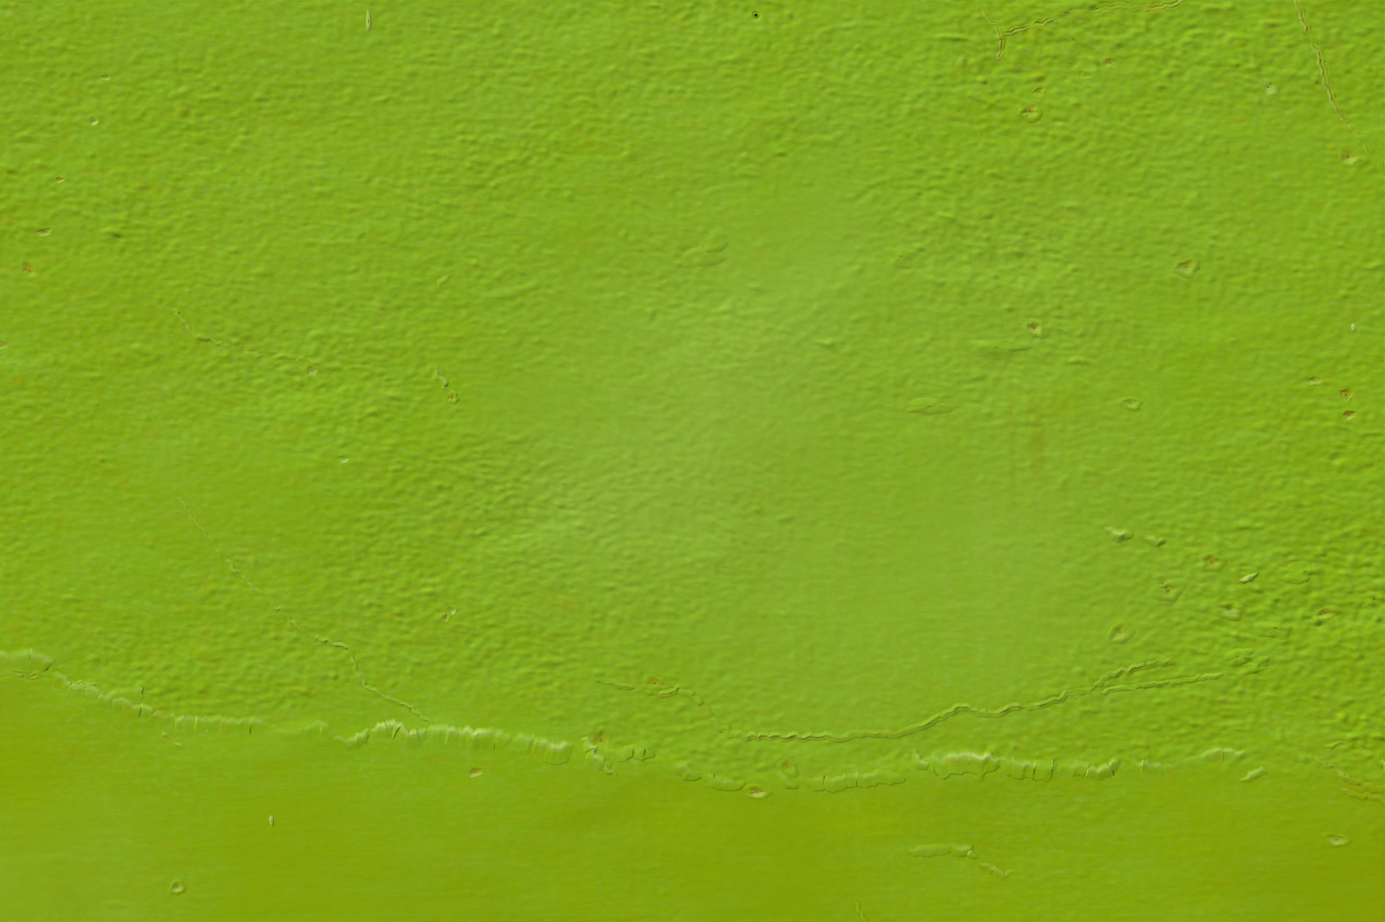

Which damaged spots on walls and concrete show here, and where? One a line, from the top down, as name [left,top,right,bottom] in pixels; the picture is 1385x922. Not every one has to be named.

spalling [0,647,618,779]
spalling [910,748,1270,783]